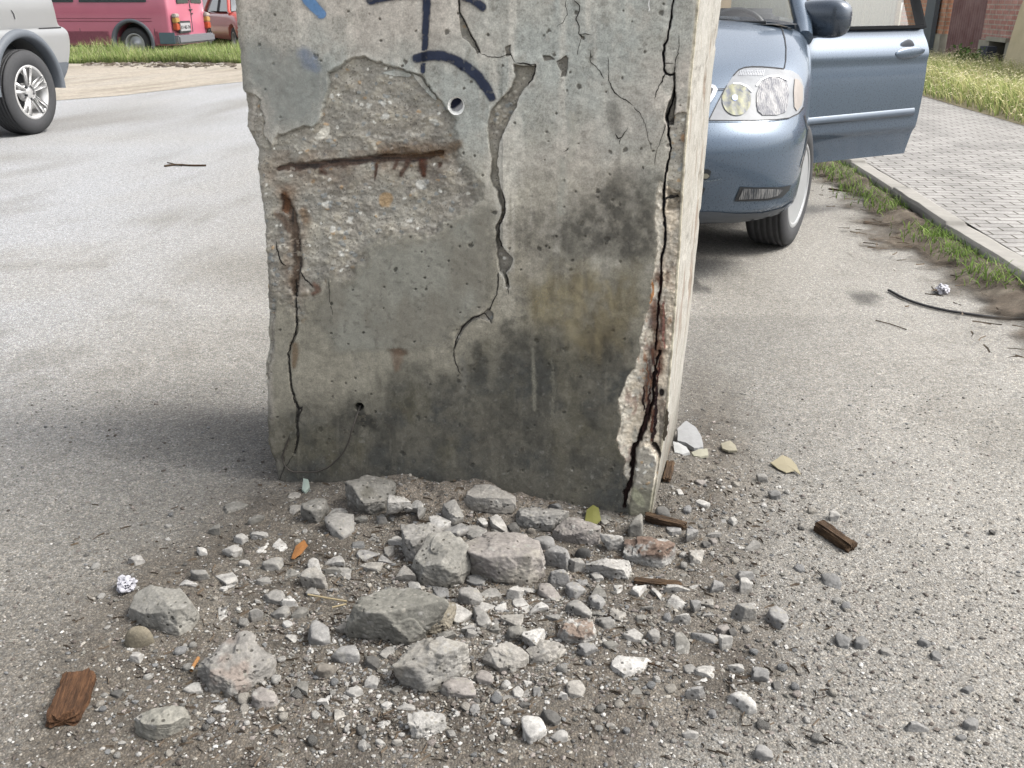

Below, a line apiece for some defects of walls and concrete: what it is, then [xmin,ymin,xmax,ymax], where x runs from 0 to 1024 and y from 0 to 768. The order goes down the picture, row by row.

corrosion [275,192,302,296]
crack [276,242,333,479]
corrosion [277,150,444,178]
spalling [254,57,479,379]
leakage [267,275,634,514]
leakage [554,180,655,259]
crack [559,0,680,350]
spalling [600,112,708,551]